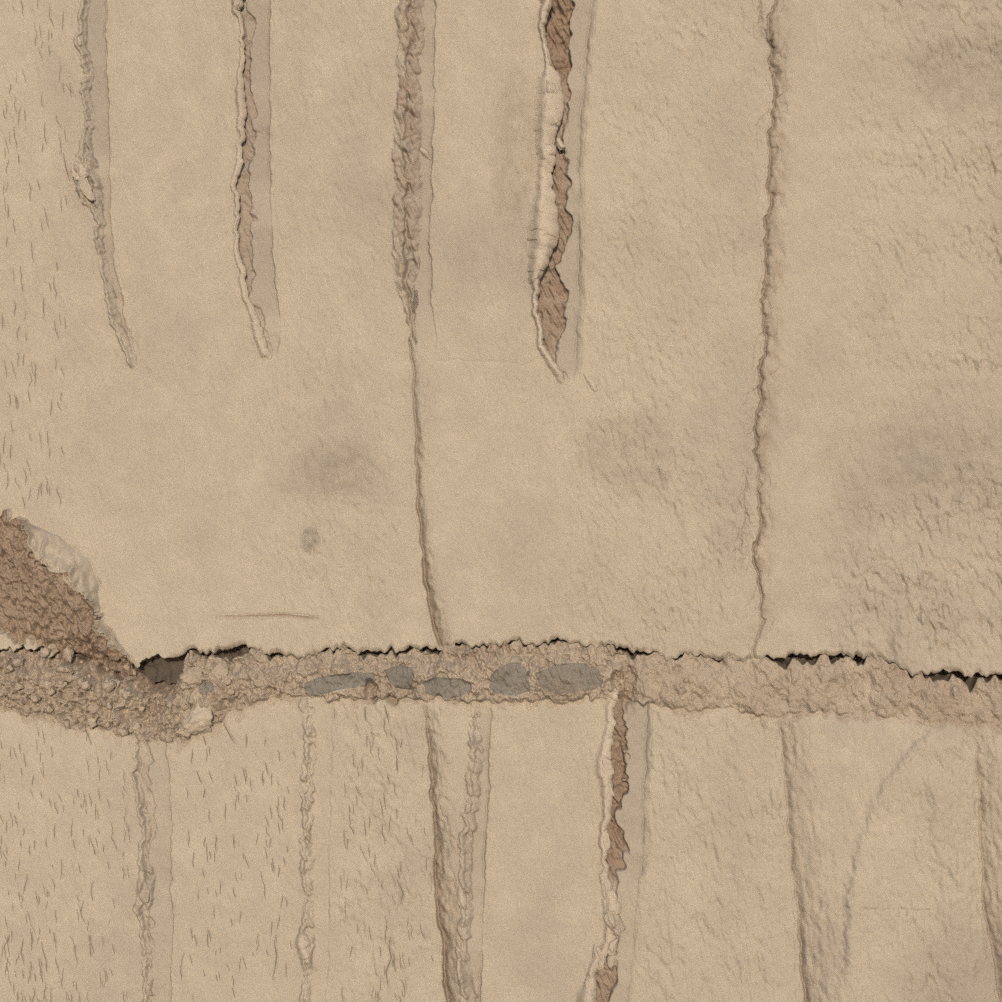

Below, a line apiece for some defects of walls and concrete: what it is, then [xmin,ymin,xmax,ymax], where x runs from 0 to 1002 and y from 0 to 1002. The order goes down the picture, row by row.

crack [0,0,141,509]
crack [228,0,285,359]
crack [361,0,559,658]
crack [526,0,598,392]
crack [734,0,864,667]
spalling [0,509,144,682]
crack [139,644,281,685]
crack [213,612,319,621]
crack [617,646,653,660]
crack [898,666,1002,691]
crack [0,695,496,1002]